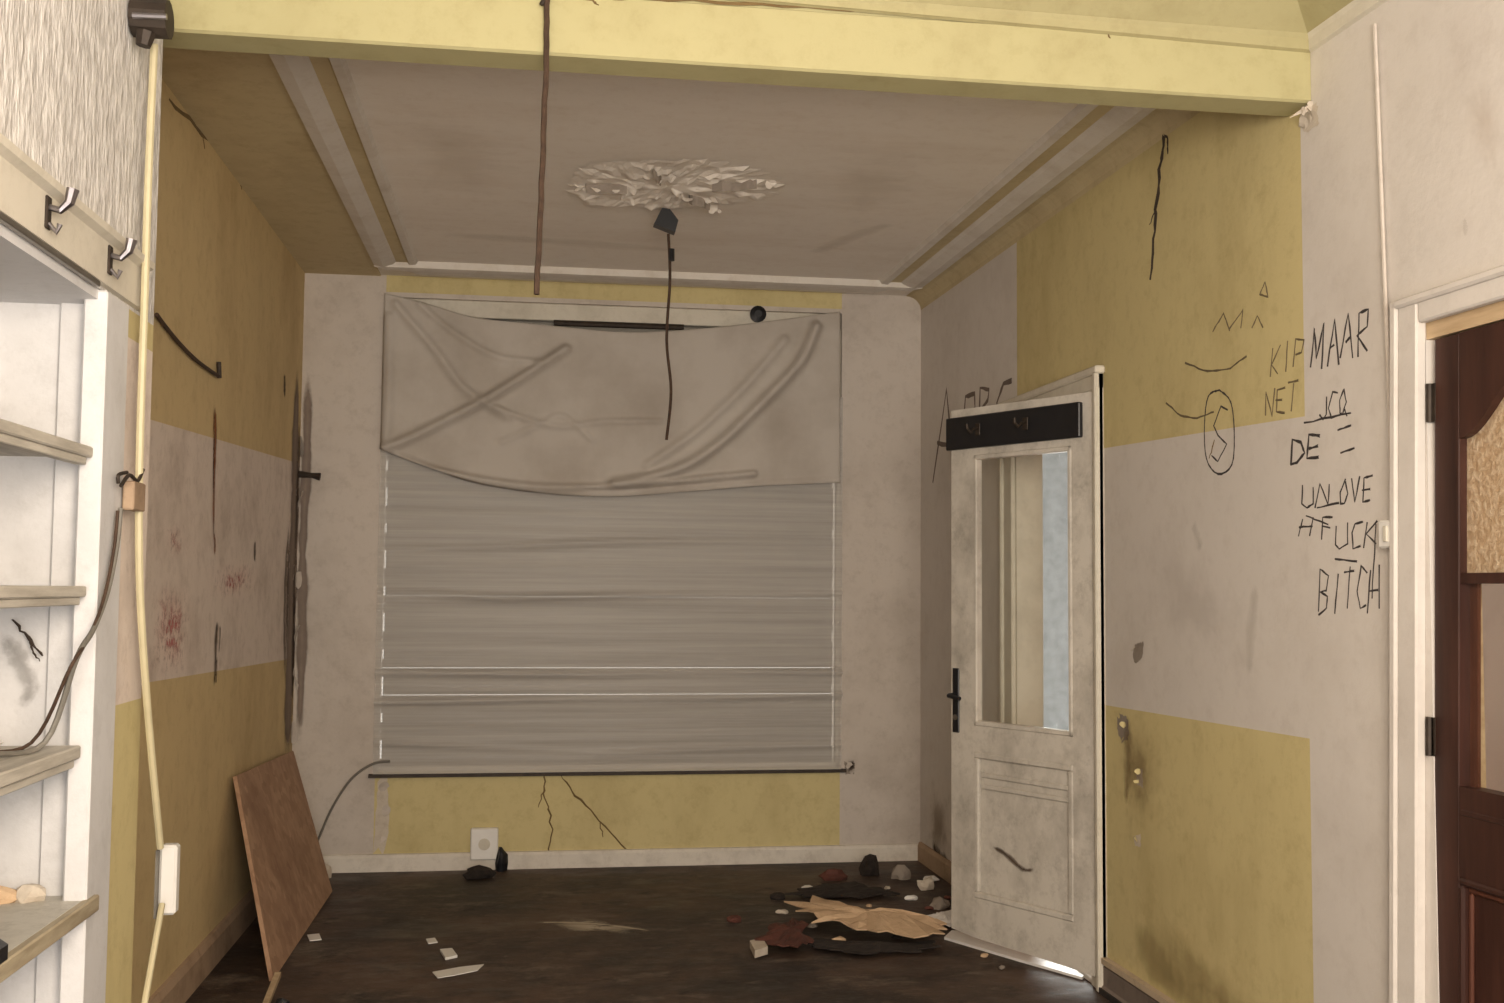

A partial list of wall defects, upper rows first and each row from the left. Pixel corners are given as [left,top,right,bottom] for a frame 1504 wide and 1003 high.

spalling [564,158,785,214]
crack [1149,134,1168,280]
crack [538,776,626,851]